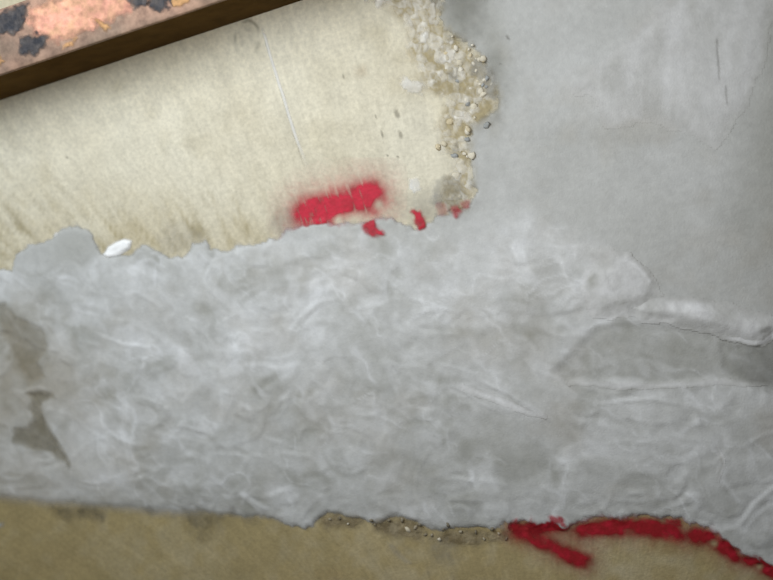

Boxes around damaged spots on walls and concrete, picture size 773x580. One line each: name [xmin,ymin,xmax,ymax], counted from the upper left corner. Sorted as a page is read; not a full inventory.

peeling [0,3,47,56]
peeling [127,0,173,12]
spalling [375,0,496,209]
spalling [104,239,131,258]